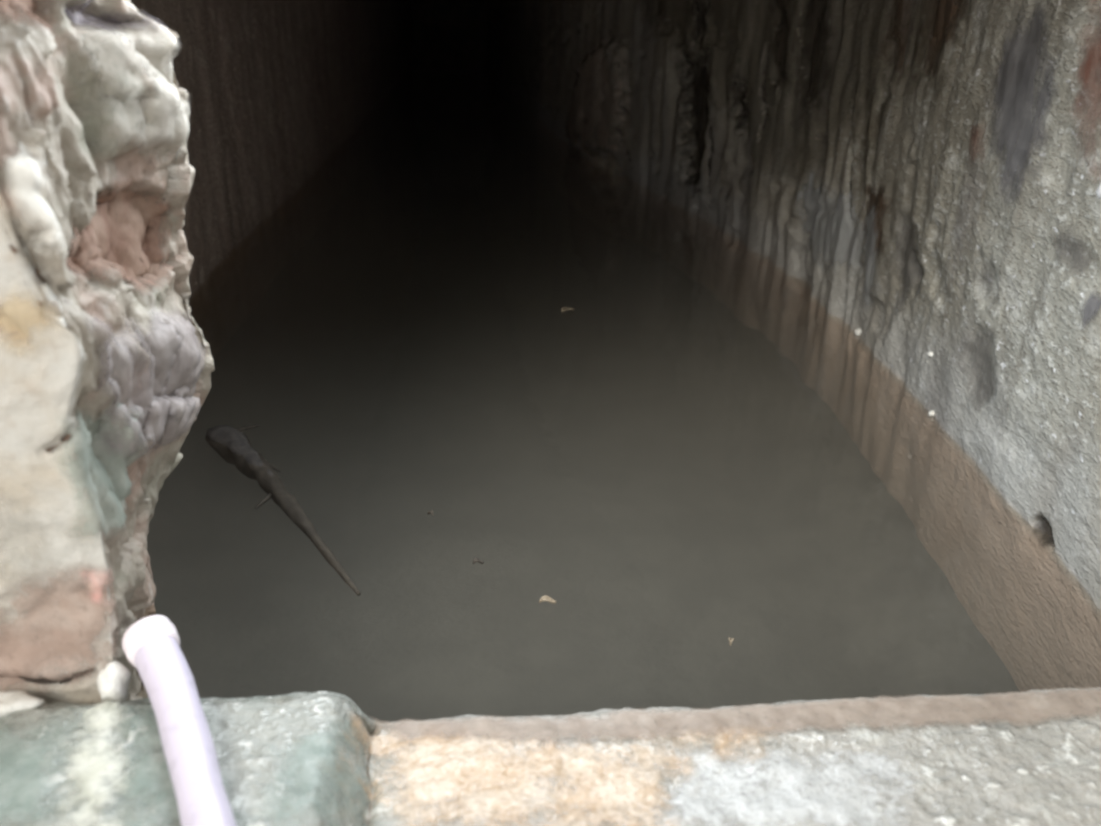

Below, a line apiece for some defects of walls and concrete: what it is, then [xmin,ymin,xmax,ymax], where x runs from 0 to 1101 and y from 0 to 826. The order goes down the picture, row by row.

spalling [0,0,40,21]
spalling [64,2,149,29]
damp [801,0,830,109]
spalling [66,179,173,290]
damp [797,174,887,305]
damp [895,219,923,306]
damp [1083,295,1101,324]
damp [970,334,993,405]
spalling [0,570,115,692]